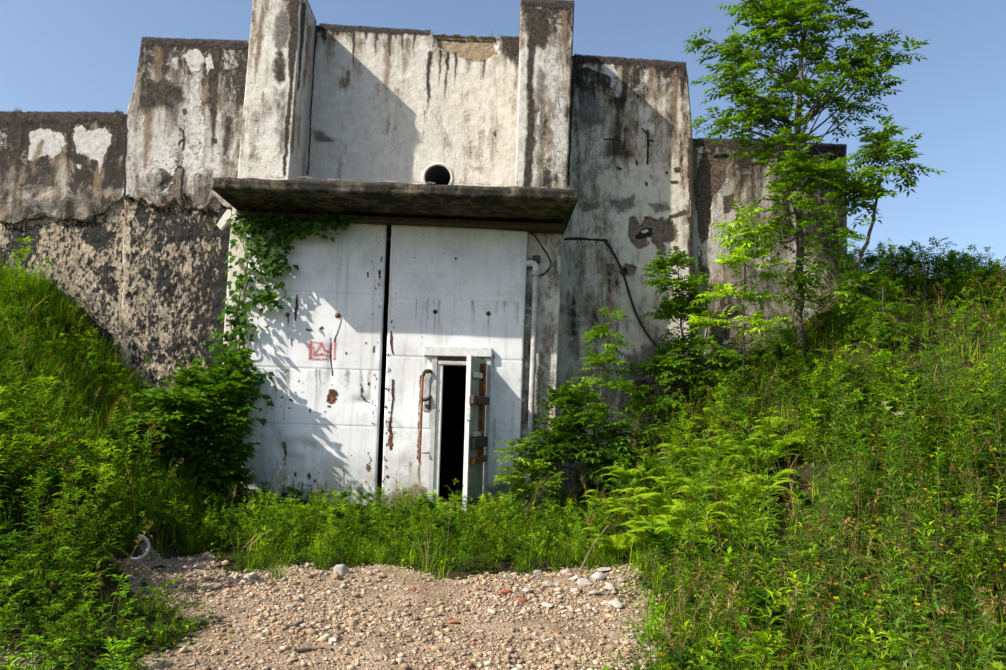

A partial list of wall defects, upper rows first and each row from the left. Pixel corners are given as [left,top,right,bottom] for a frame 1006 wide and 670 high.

water stain [0,109,124,193]
spalling [0,49,237,398]
water stain [140,0,431,176]
water stain [426,50,470,102]
flaking render [435,34,501,63]
water stain [500,0,574,187]
water stain [574,54,687,158]
flaking render [628,146,742,283]
water stain [687,137,847,295]
rust [324,312,342,412]
rust [272,369,431,509]
rust [487,483,516,509]